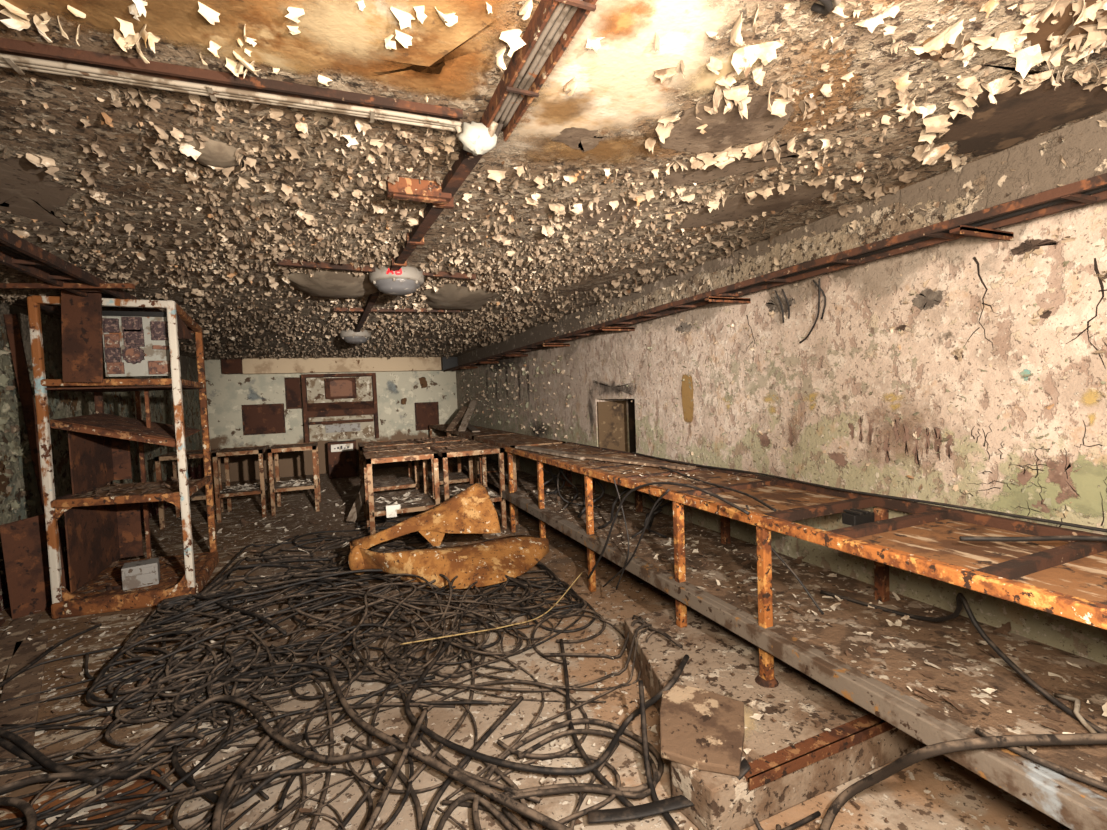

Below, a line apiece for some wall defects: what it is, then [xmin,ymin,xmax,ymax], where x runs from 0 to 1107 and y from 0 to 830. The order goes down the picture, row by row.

corrosion [0,0,501,97]
water stain [516,0,760,161]
peeling [0,0,1107,468]
water stain [848,393,953,467]